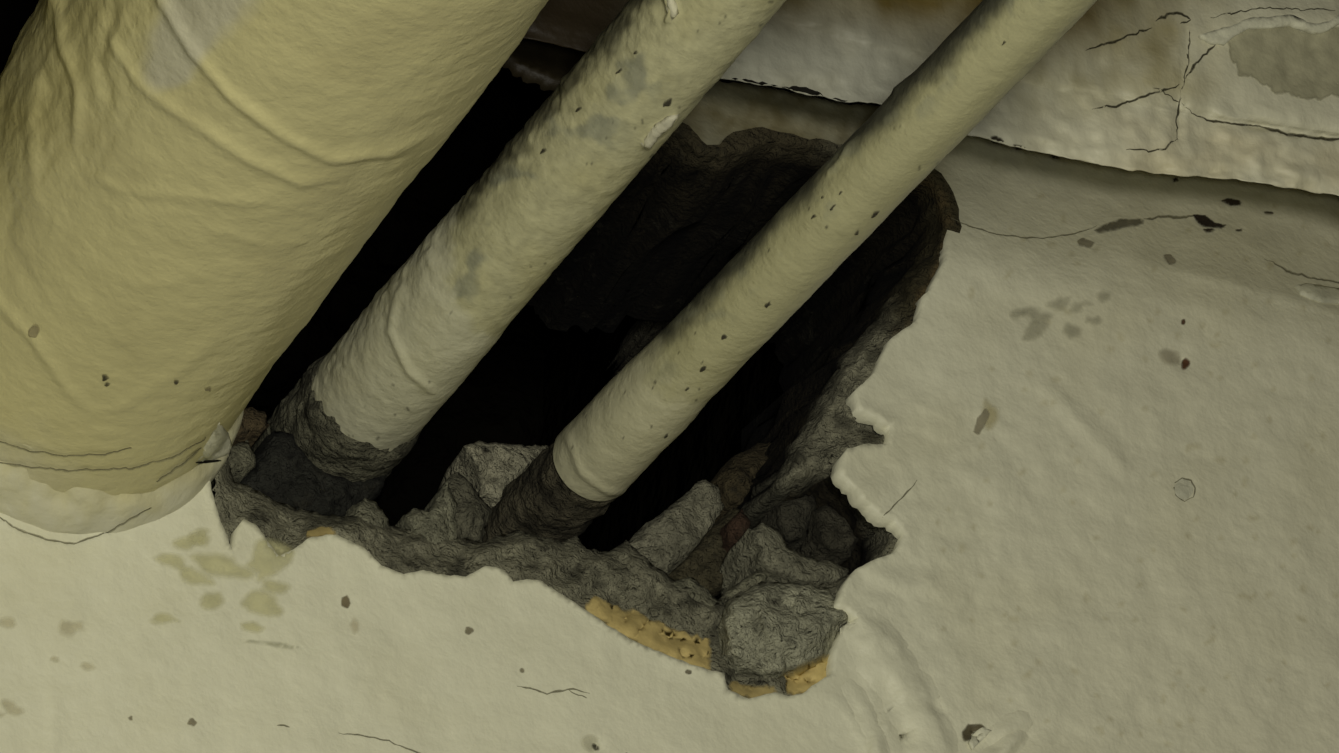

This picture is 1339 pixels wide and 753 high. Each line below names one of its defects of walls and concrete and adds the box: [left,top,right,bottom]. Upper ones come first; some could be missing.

crack [1085,7,1339,153]
peeling [1198,15,1339,99]
spalling [527,99,842,333]
spalling [737,169,962,598]
leakage [159,531,292,630]
spalling [196,422,829,699]